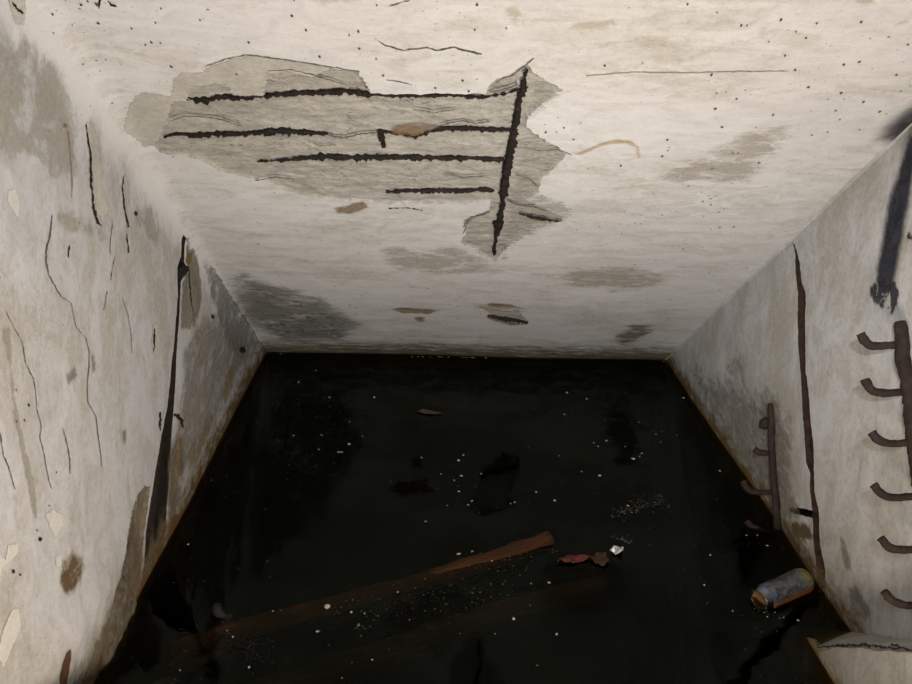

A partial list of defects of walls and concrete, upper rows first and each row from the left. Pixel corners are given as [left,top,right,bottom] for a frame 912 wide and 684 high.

crack [0,433,15,488]
crack [6,312,71,489]
crack [45,216,102,464]
spalling [124,55,567,262]
rust [163,69,529,255]
damp [123,268,869,633]
spalling [475,303,529,323]
rust [519,211,560,222]
damp [870,136,912,314]
rust [61,554,83,593]
damp [76,611,112,684]